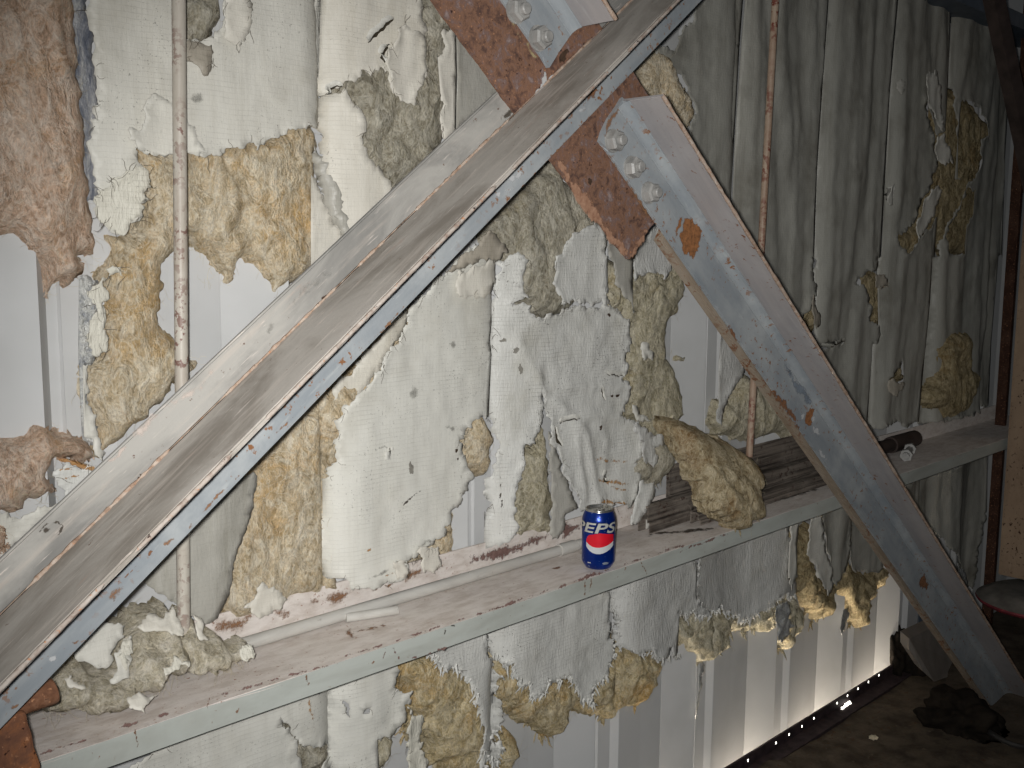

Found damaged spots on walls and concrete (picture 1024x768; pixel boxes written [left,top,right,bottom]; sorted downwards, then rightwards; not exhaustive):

peeling [128,93,173,156]
peeling [187,121,206,156]
peeling [926,70,953,166]
peeling [916,185,942,239]
corrosion [0,0,681,693]
corrosion [661,94,1024,683]
peeling [788,515,833,596]
peeling [405,707,430,768]